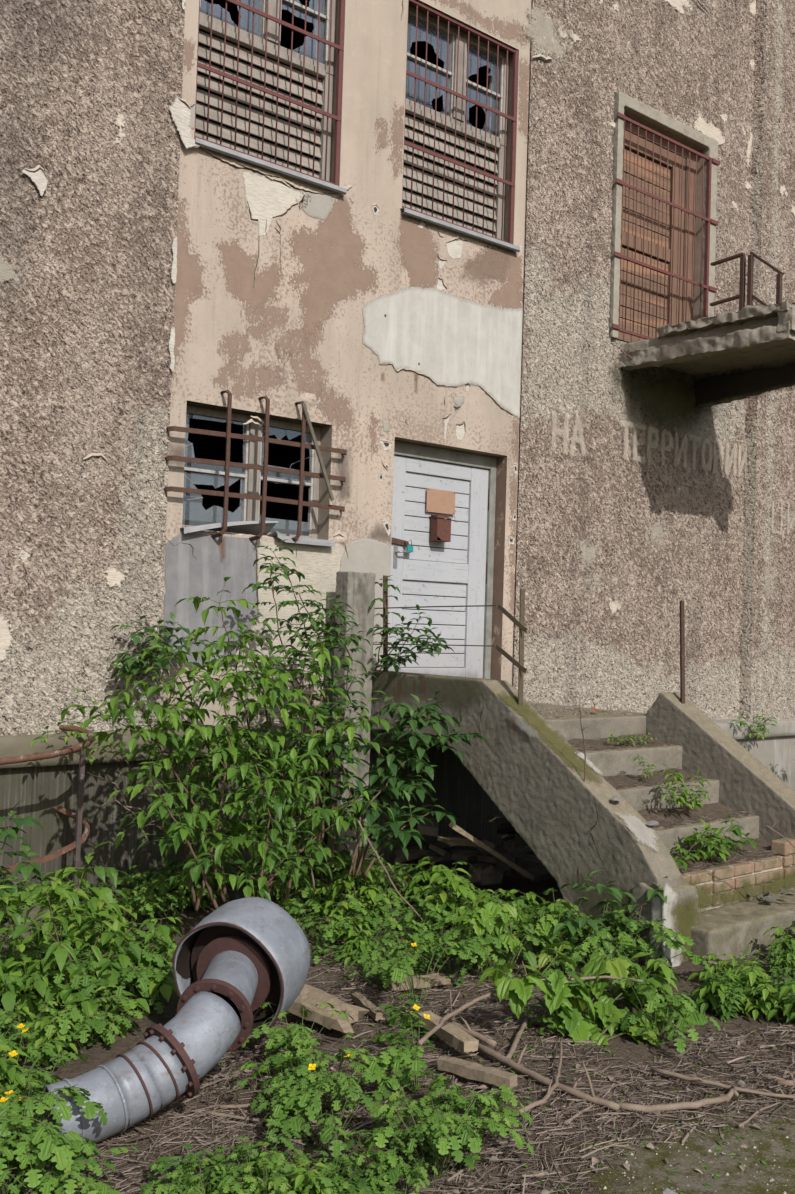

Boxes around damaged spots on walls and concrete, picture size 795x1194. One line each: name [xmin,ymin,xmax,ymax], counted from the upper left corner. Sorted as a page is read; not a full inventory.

flaking render [663,0,692,14]
flaking render [22,165,48,196]
flaking render [242,171,305,236]
flaking render [436,236,468,290]
flaking render [443,406,466,440]
spalling [611,796,659,851]